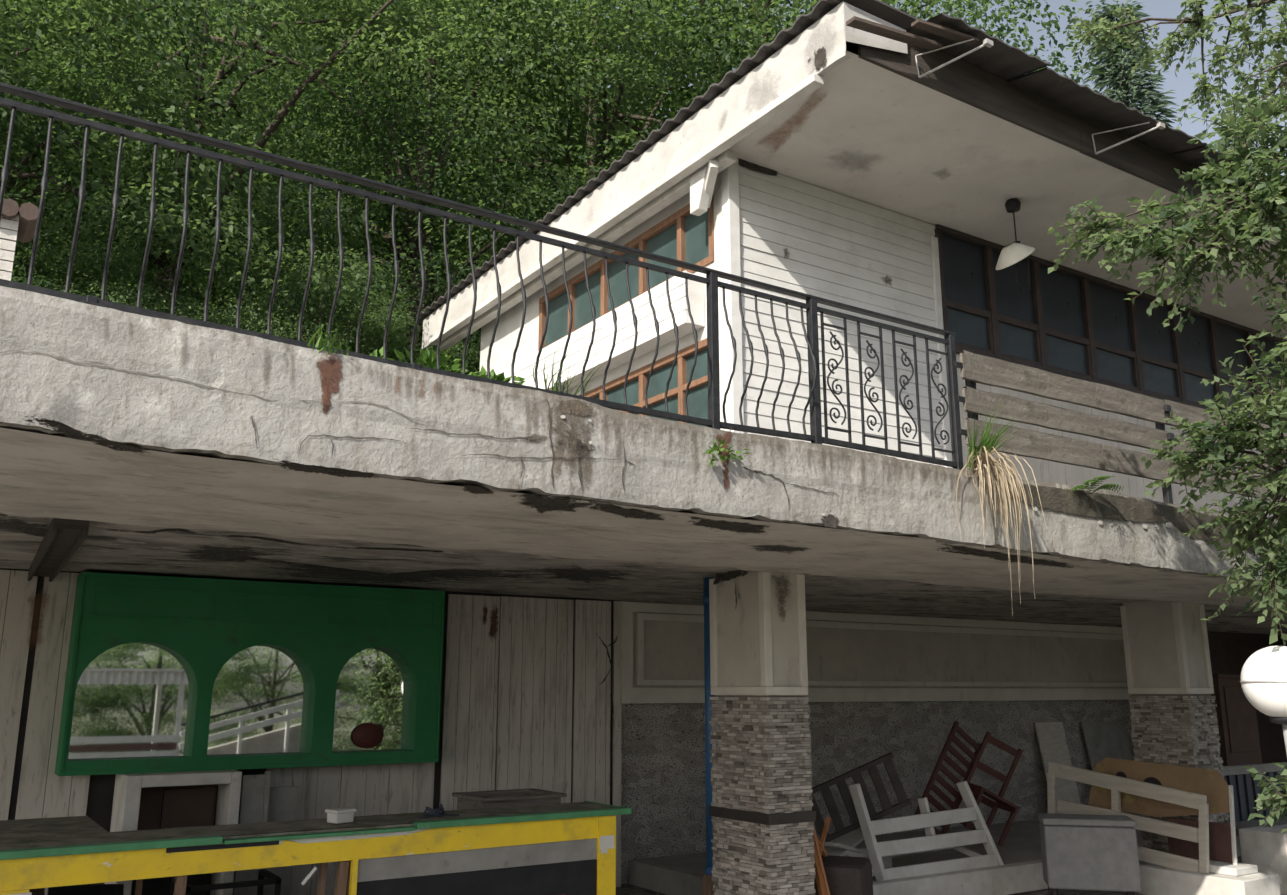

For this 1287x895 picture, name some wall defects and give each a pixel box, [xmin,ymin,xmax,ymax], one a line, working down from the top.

crack [0,350,278,446]
rust [317,353,343,414]
crack [299,399,634,493]
leakage [521,400,593,484]
spalling [511,495,665,522]
spalling [687,516,769,536]
crack [738,465,838,510]
spalling [936,544,1076,569]
rust [483,607,499,639]